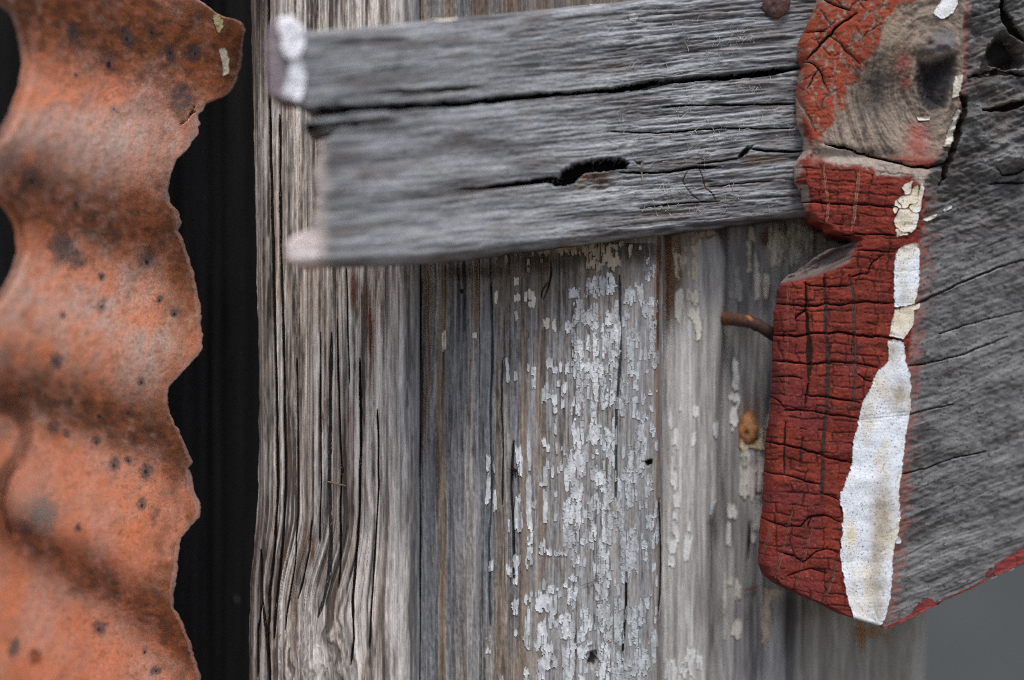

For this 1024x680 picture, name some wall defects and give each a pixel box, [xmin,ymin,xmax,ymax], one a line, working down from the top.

rust [14,0,242,110]
rust [0,373,194,670]
rust [3,172,195,316]
peeling [485,454,497,512]
peeling [488,240,703,680]
crack [257,0,1024,680]
peeling [839,181,1024,629]